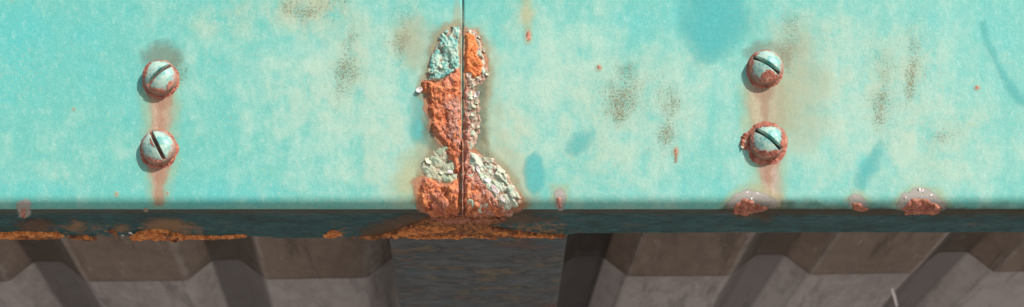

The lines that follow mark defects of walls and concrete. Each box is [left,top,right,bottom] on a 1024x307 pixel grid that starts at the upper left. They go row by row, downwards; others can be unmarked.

rust [140,60,180,211]
rust [726,51,788,218]